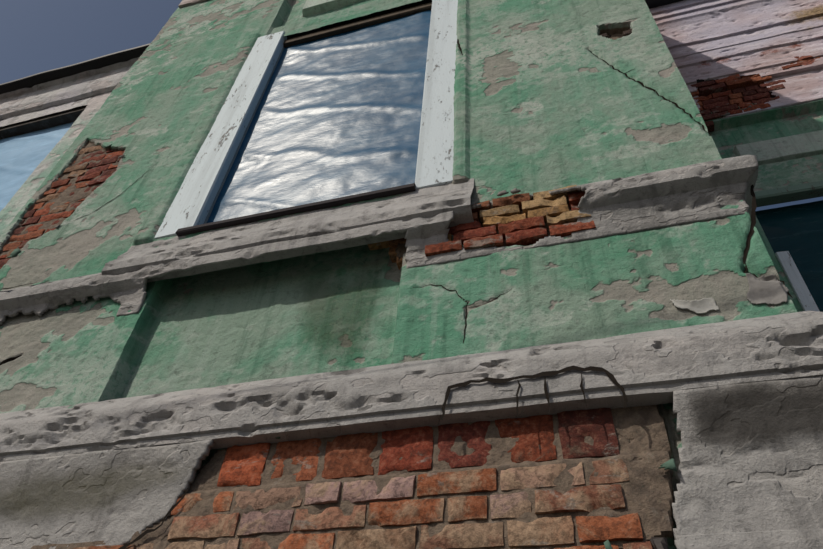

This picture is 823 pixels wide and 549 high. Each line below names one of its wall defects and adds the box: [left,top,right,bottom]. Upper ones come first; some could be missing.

crack [589,50,712,136]
flaking render [690,73,786,132]
flaking render [782,56,821,70]
flaking render [0,144,125,269]
flaking render [425,185,596,257]
crack [743,184,793,298]
crack [413,284,510,343]
crack [440,365,628,420]
flaking render [165,408,652,549]